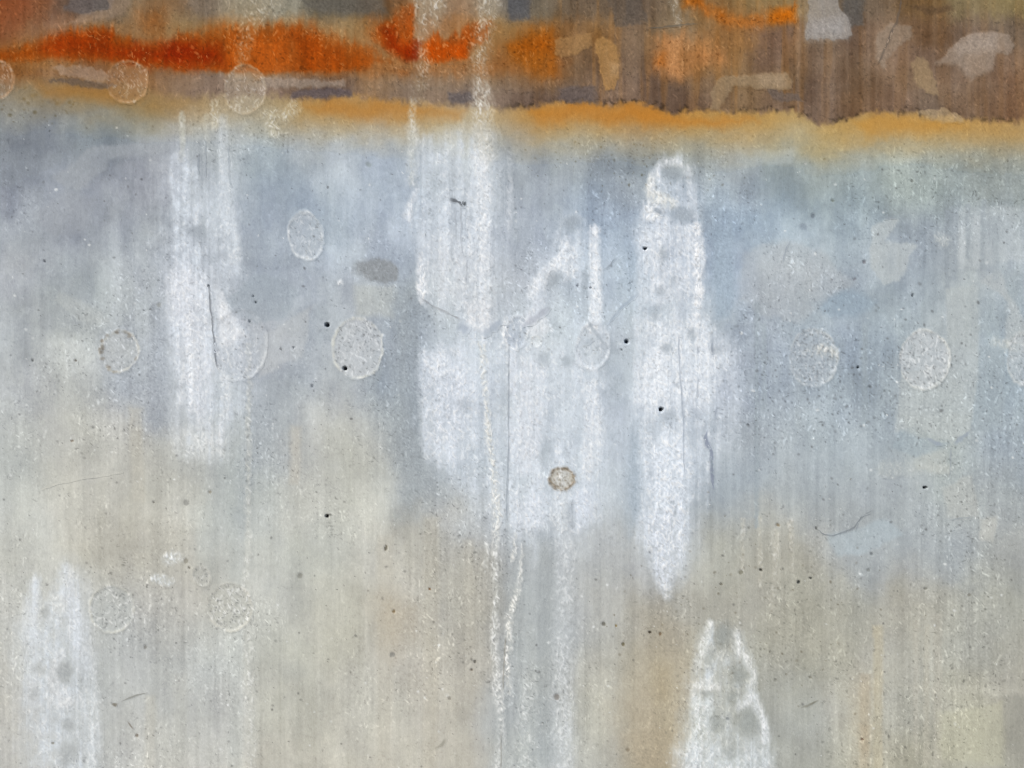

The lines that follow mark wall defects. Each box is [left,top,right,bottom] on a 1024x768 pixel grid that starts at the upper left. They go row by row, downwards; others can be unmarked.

water stain [13,66,107,94]
water stain [44,0,126,26]
corrosion [0,0,243,78]
corrosion [0,88,470,160]
water stain [170,0,399,64]
corrosion [249,0,414,83]
corrosion [429,13,474,69]
corrosion [645,0,803,90]
corrosion [493,15,1024,177]
water stain [132,73,257,595]
water stain [258,0,1024,768]